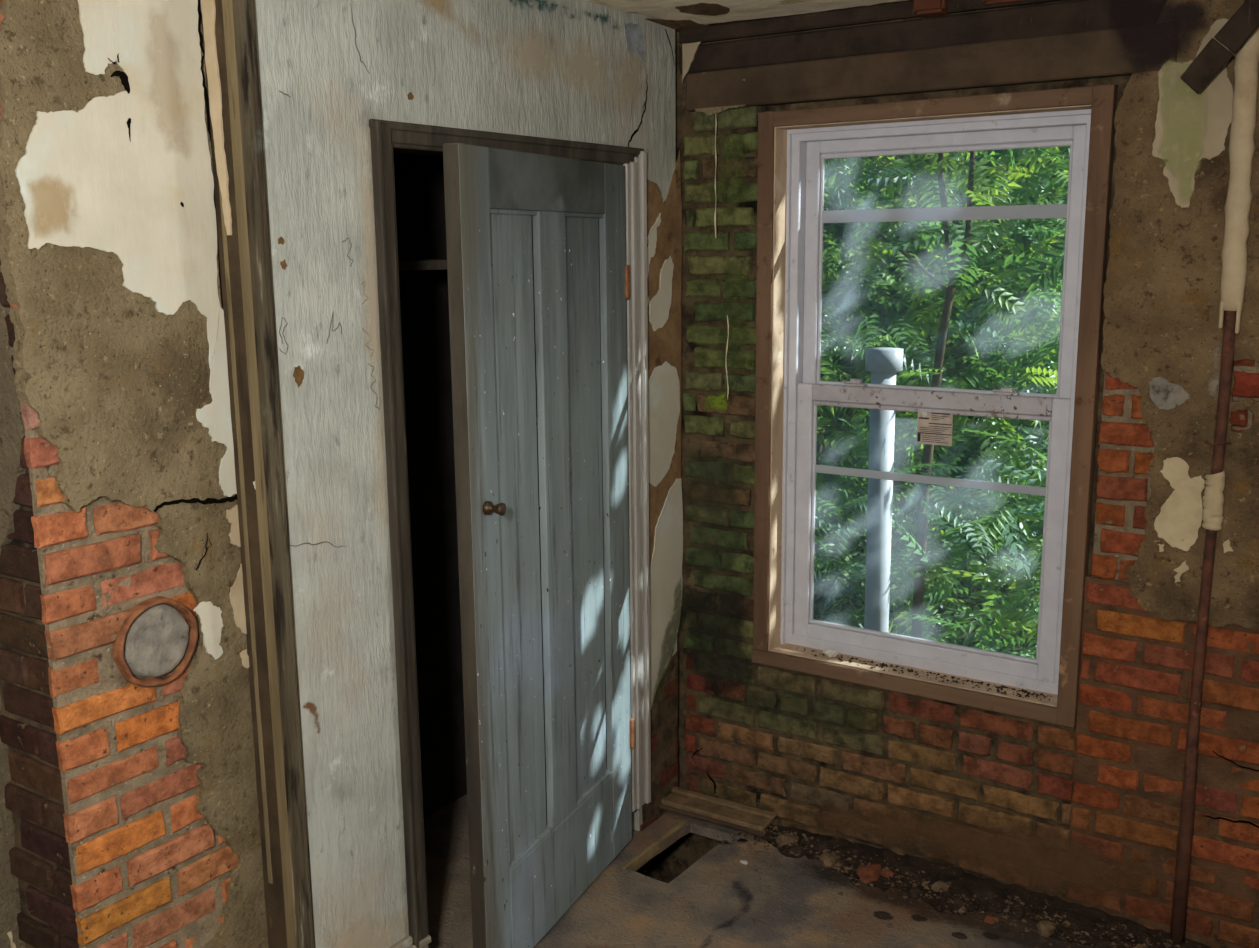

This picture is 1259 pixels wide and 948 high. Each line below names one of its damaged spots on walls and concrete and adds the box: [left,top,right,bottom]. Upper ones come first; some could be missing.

water stain [510,0,558,11]
peeling [1152,19,1233,208]
spalling [0,260,20,375]
peeling [15,0,241,547]
crack [154,494,237,571]
spalling [640,105,1259,948]
spalling [0,403,247,948]
peeling [240,649,249,668]
rust [303,702,320,733]
water stain [654,585,750,701]
crack [1213,751,1259,772]
crack [1202,815,1259,828]